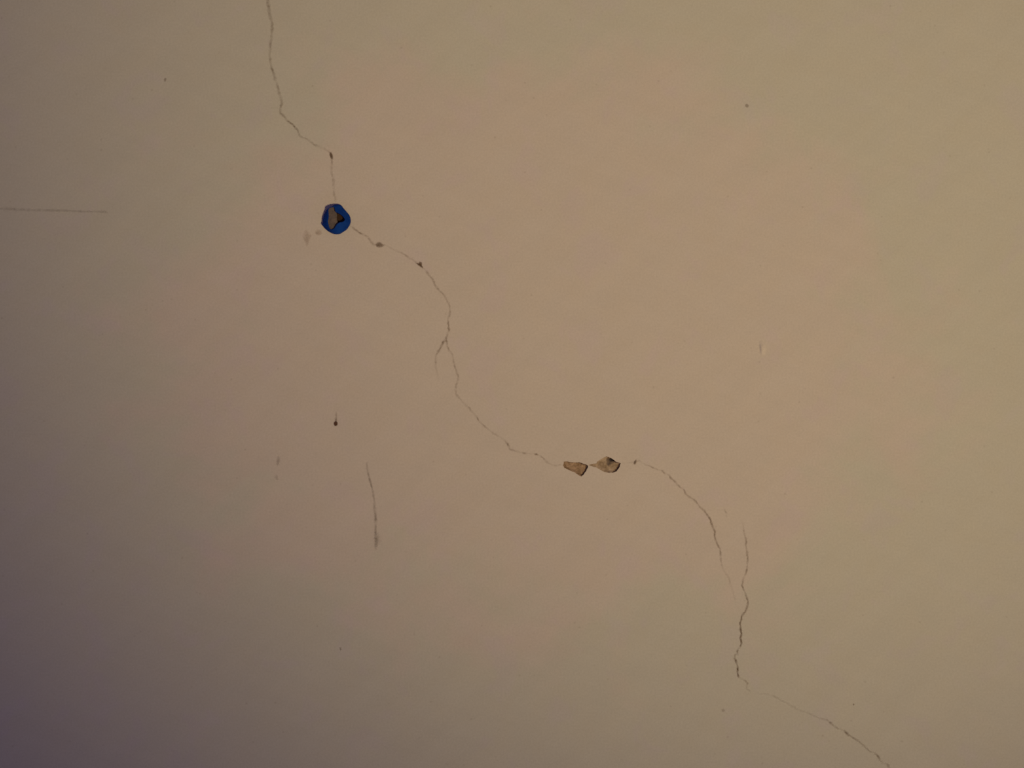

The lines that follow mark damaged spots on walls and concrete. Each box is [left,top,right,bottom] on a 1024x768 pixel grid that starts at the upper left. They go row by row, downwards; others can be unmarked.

flaking render [563,456,621,476]